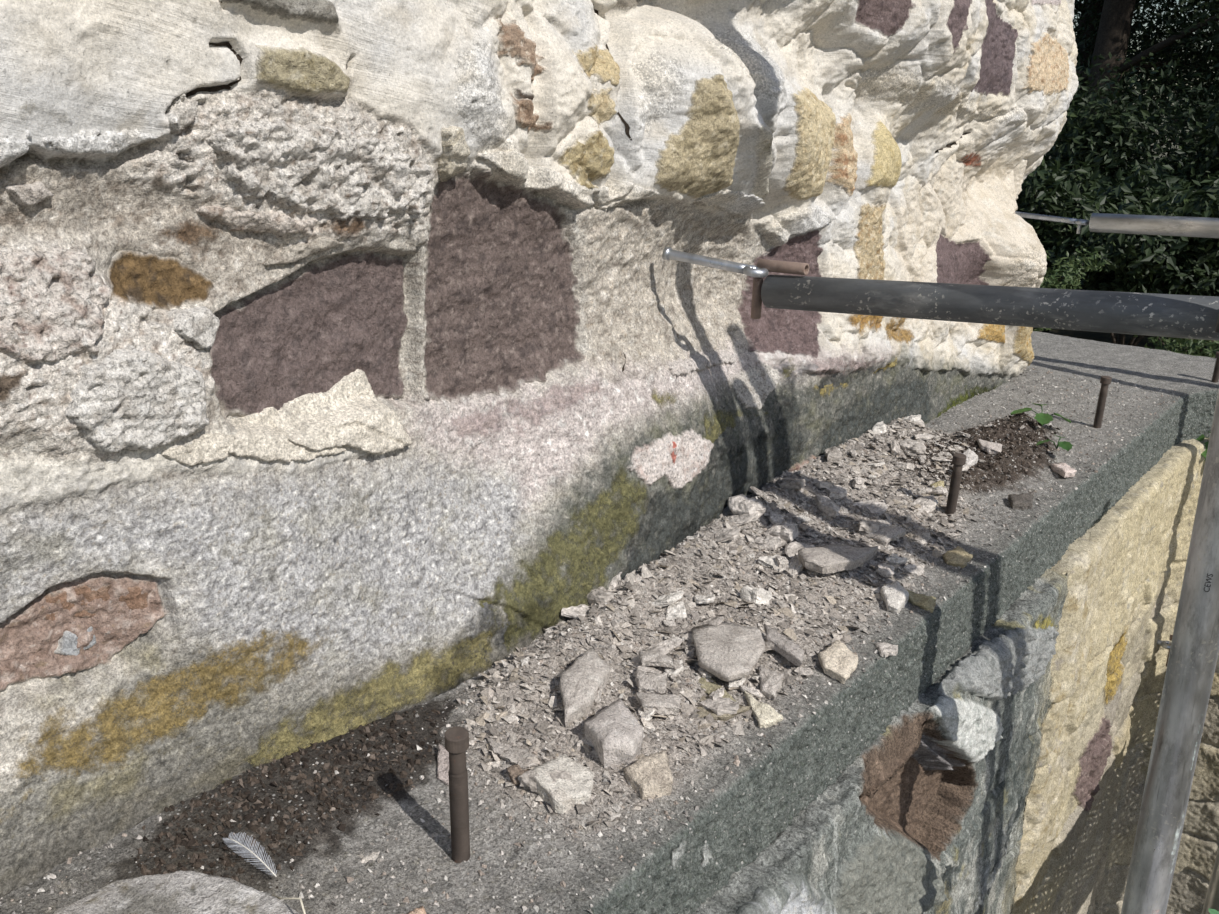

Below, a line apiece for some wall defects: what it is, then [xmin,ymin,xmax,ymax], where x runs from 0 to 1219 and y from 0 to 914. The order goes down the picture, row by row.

spalling [0,40,660,467]
spalling [495,18,555,134]